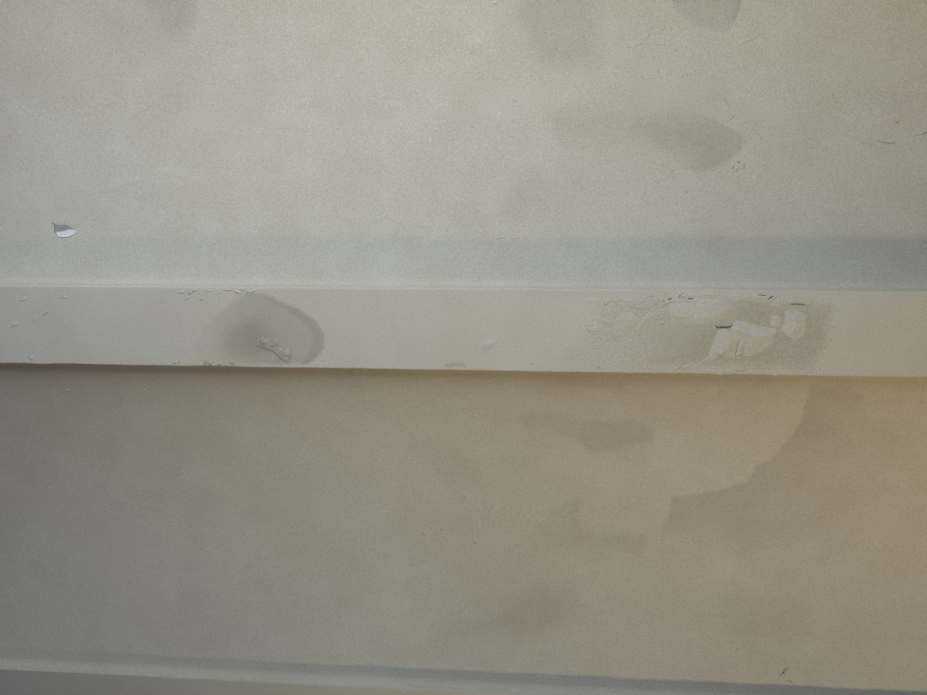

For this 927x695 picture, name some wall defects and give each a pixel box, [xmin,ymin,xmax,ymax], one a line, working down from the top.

peeling [53,223,78,237]
spalling [586,289,839,376]